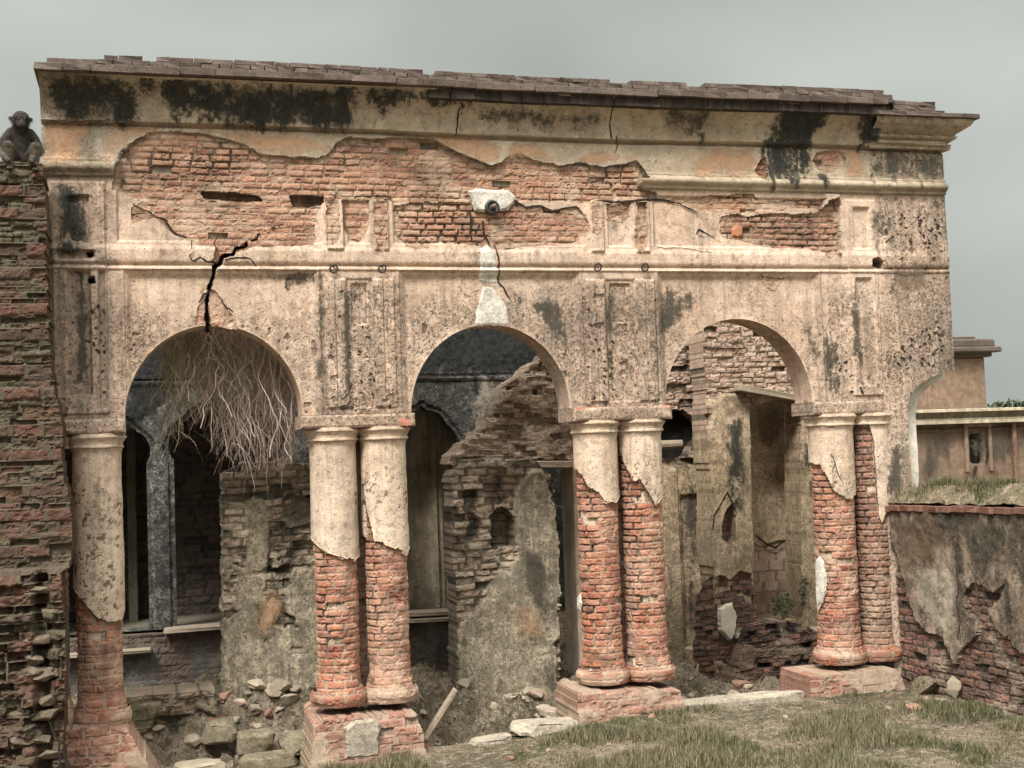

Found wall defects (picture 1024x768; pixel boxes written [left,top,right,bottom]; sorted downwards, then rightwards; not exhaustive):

crack [132,203,280,333]
spalling [113,132,655,262]
crack [469,210,510,299]
spalling [670,194,839,259]
peeling [72,586,127,713]
peeling [281,484,414,693]
peeling [575,455,671,671]
spalling [811,421,1024,717]